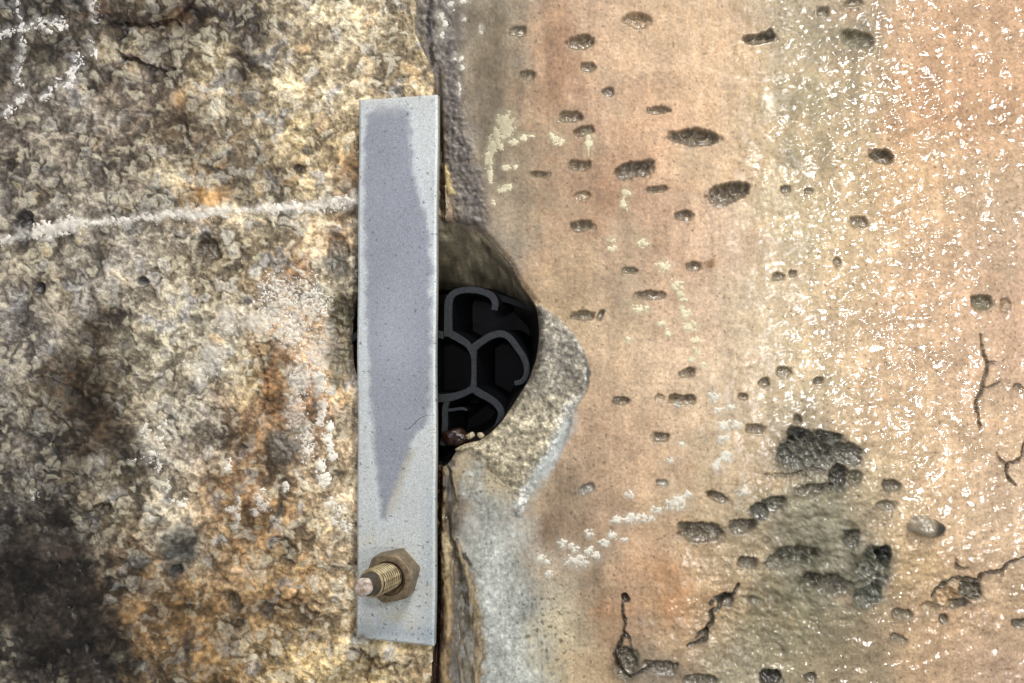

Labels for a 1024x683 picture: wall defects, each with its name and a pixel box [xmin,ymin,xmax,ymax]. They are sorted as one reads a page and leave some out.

damp [484,111,535,206]
damp [550,132,565,146]
damp [0,191,358,247]
spalling [570,310,604,321]
crack [974,334,1024,428]
crack [996,443,1024,485]
damp [556,489,692,568]
damp [0,517,130,683]
damp [537,554,553,578]
crack [613,601,654,678]
crack [687,583,740,647]
crack [931,557,1024,598]